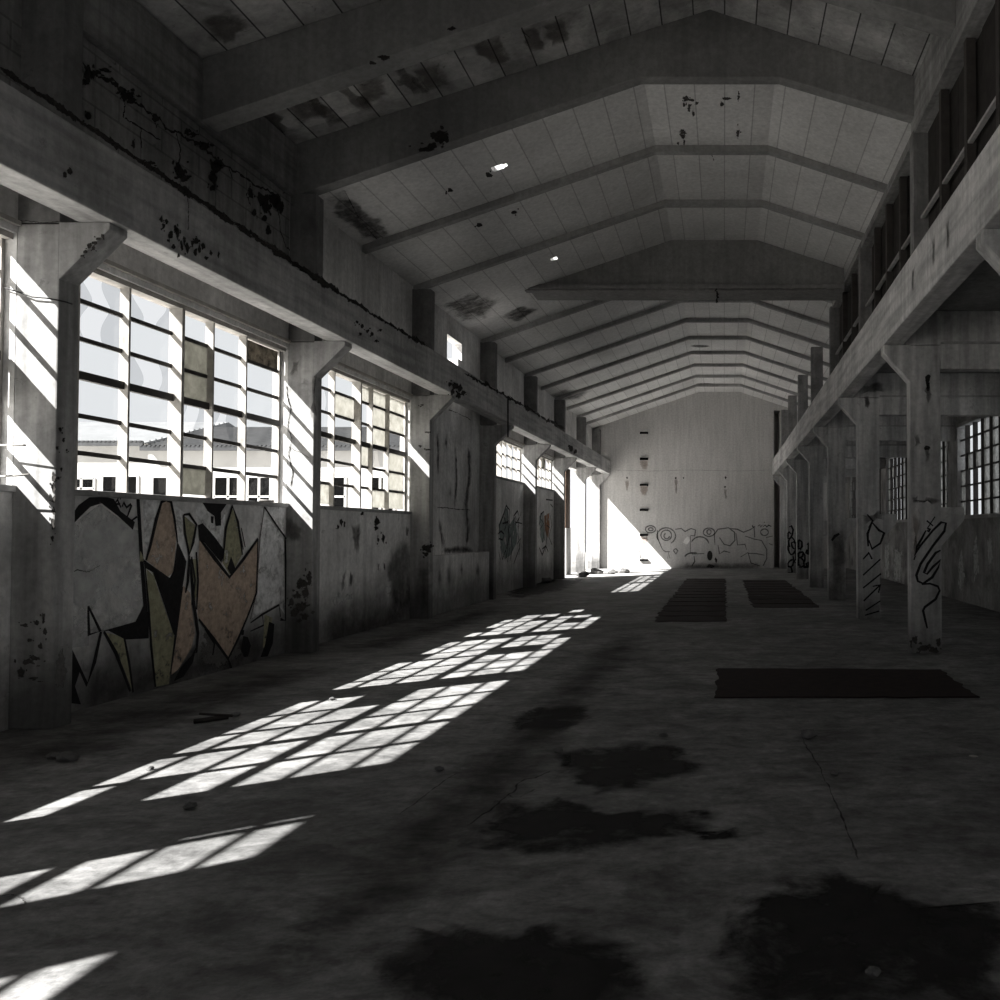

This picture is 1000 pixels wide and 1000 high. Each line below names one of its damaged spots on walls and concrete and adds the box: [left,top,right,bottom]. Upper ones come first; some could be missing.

water stain [523,24,568,49]
water stain [292,99,342,121]
spalling [409,126,449,152]
spalling [0,64,426,347]
water stain [335,200,387,239]
water stain [448,295,493,319]
water stain [507,307,536,321]
spalling [287,568,315,622]